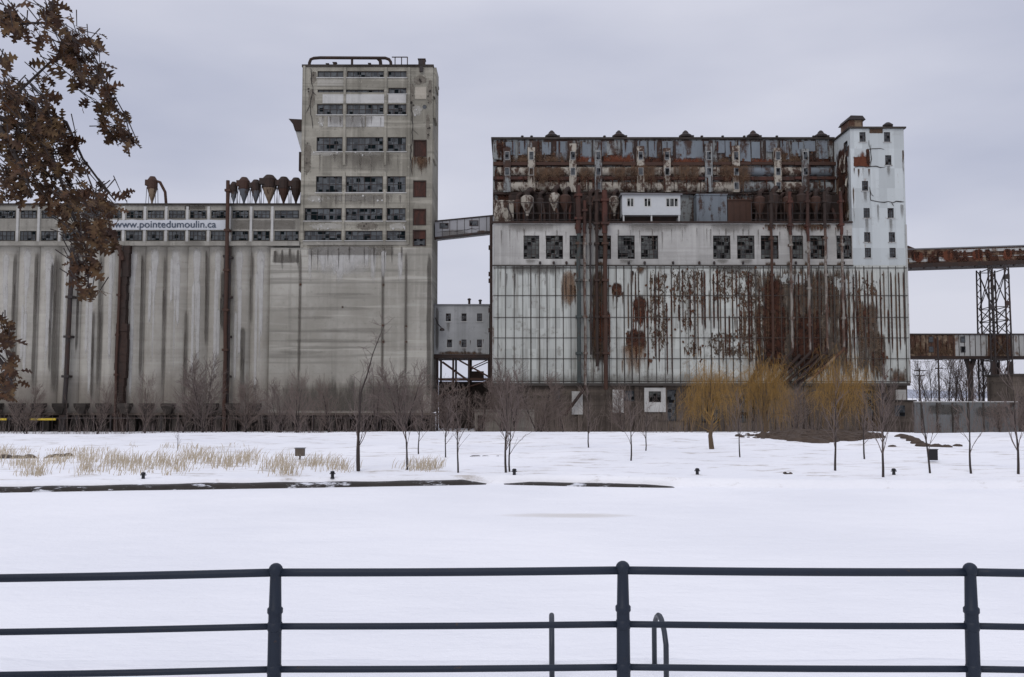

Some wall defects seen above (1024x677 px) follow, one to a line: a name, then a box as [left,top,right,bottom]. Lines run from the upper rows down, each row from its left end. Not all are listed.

rust [495,140,870,232]
crack [857,146,903,206]
damp [0,250,116,395]
damp [129,247,402,398]
rust [562,262,581,304]
rust [589,262,953,387]